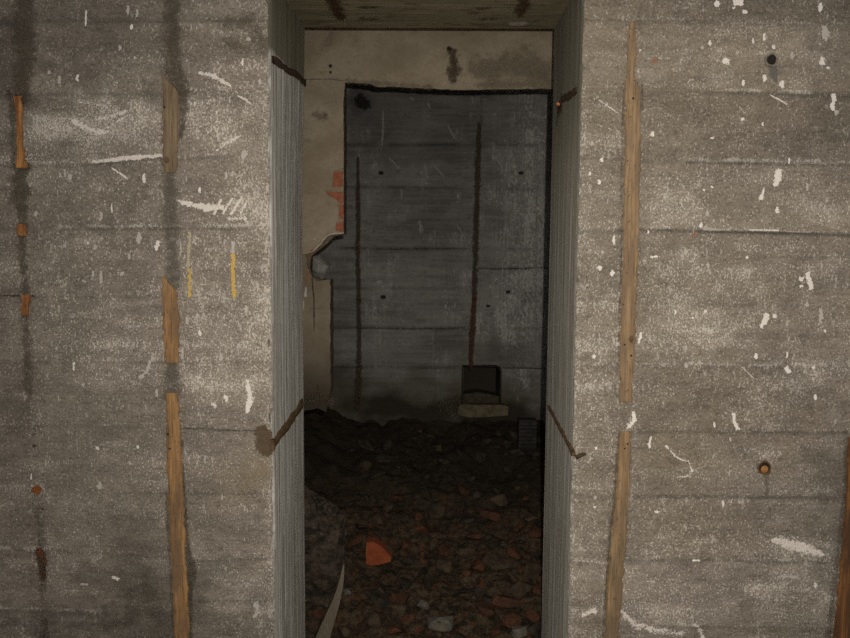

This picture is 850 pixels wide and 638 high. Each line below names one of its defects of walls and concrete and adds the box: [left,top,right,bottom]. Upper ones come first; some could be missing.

damp [6,161,29,223]
flaking render [303,168,344,310]
rust [354,157,363,411]
rust [468,123,481,370]
rust [255,425,273,456]
rust [35,548,47,582]